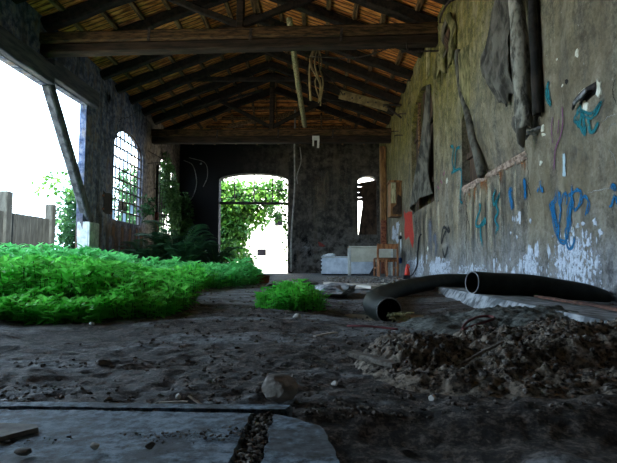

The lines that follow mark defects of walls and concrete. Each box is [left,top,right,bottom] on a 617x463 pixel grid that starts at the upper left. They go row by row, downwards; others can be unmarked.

peeling [407,218,608,289]